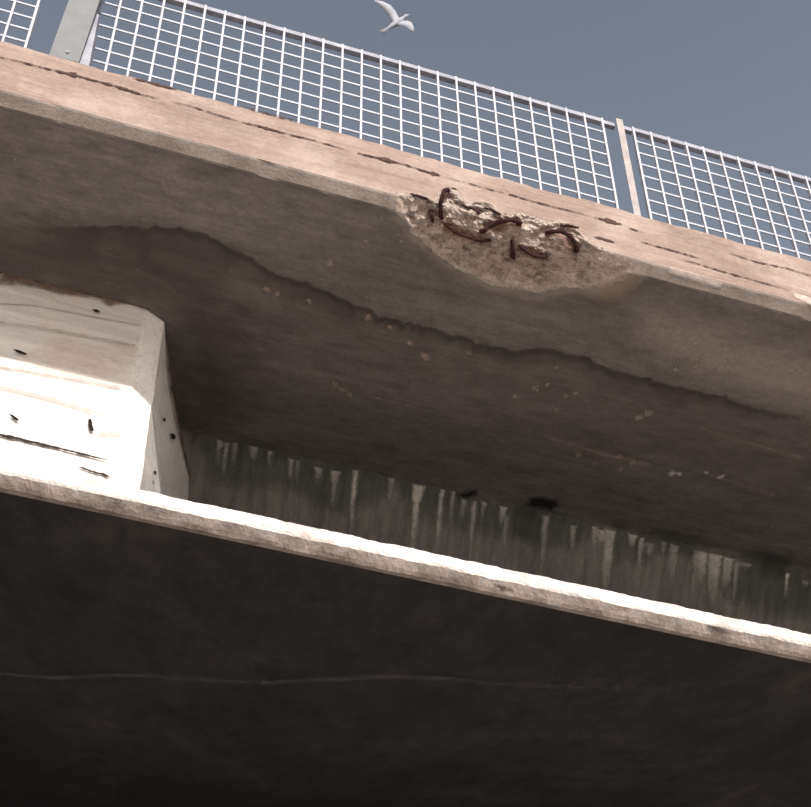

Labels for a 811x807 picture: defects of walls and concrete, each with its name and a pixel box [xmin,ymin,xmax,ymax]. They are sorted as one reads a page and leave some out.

spalling [395,188,633,293]
water stain [315,467,340,490]
water stain [413,484,425,528]
water stain [437,489,487,539]
water stain [592,526,616,566]
water stain [628,534,652,555]
water stain [693,550,751,582]